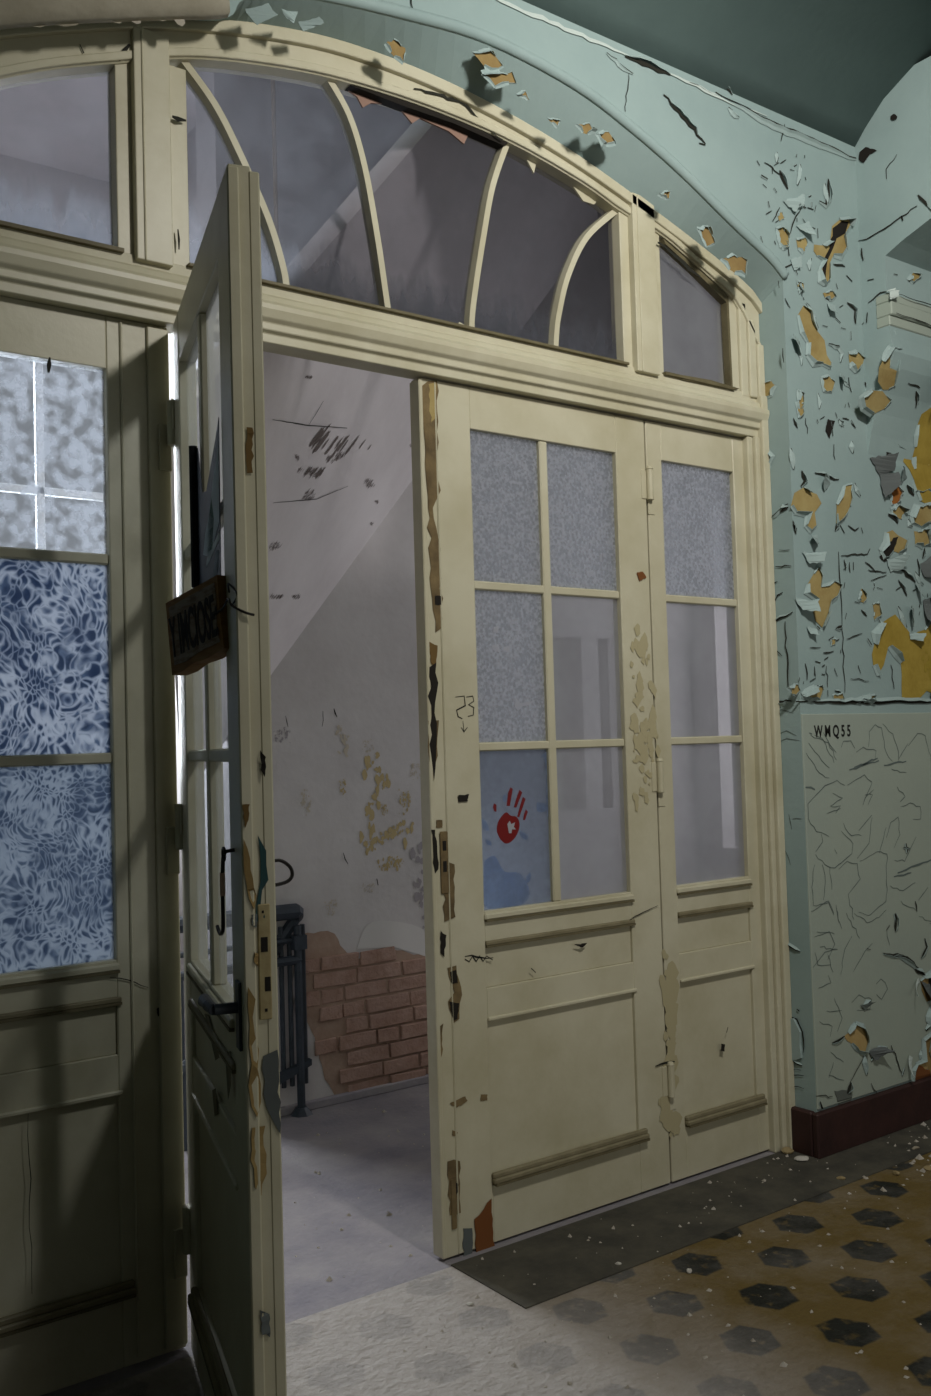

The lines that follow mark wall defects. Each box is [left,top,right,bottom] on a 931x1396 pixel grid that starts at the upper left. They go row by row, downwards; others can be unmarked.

peeling [384,38,406,65]
peeling [472,47,530,101]
peeling [547,117,616,147]
peeling [696,225,748,278]
peeling [761,152,901,438]
peeling [887,272,923,299]
peeling [768,408,931,706]
flaking render [305,931,429,1095]
peeling [916,969,931,1003]
peeling [845,1002,931,1082]